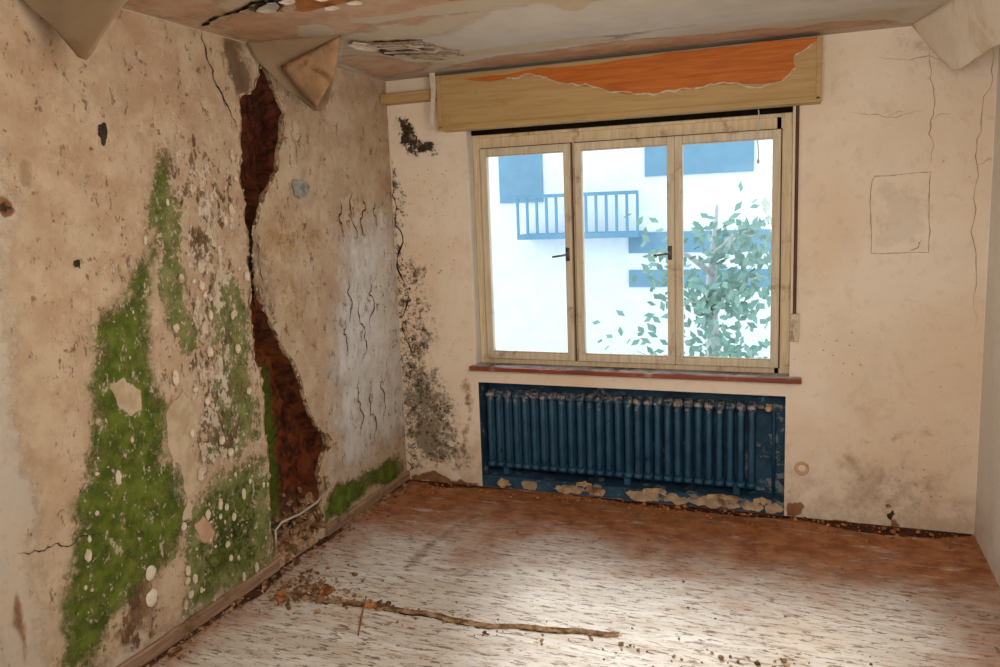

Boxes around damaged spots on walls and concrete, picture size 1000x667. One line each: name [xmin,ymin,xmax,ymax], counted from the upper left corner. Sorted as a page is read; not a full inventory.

flaking render [396,117,438,156]
crack [339,195,377,239]
water stain [324,162,478,522]
peeling [99,374,142,418]
water stain [62,149,275,667]
peeling [193,507,222,554]
peeling [343,481,389,513]
peeling [497,478,537,490]
peeling [554,481,605,497]
peeling [625,488,784,514]
spalling [885,504,899,527]
peeling [73,573,145,667]